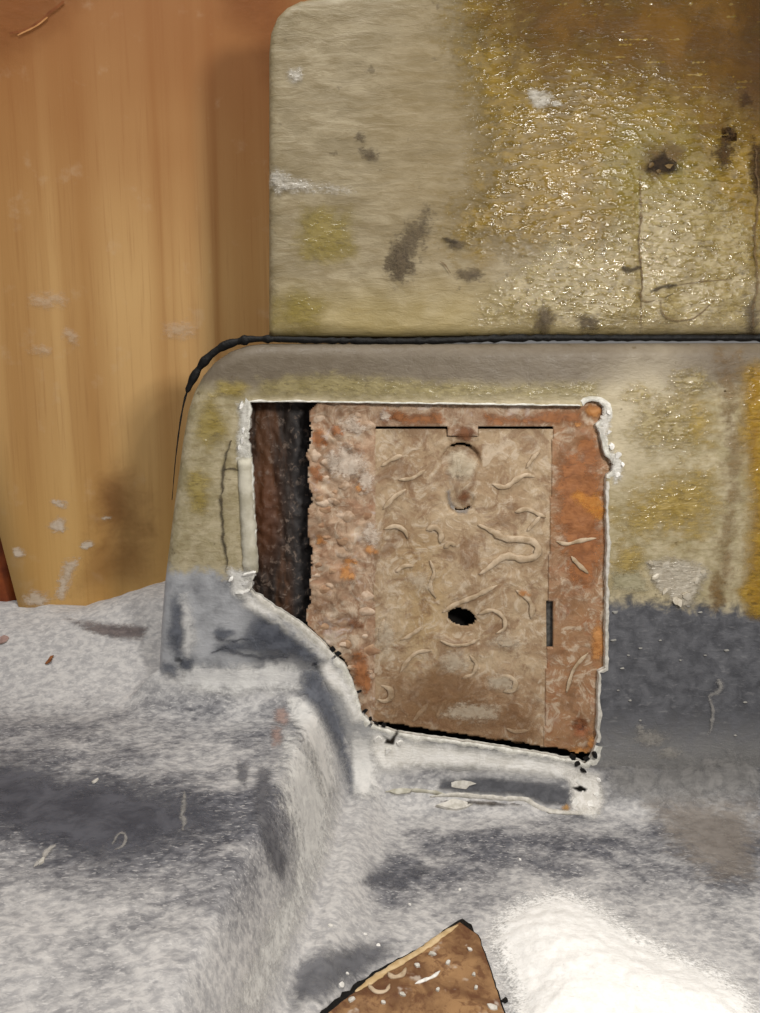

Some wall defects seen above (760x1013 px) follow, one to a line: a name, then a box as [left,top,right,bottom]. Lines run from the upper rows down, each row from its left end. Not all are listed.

damp [450,0,760,282]
damp [385,208,430,281]
crack [622,184,731,327]
rust [311,426,344,447]
rust [385,410,444,424]
rust [484,405,602,427]
rust [554,438,604,588]
damp [627,469,720,539]
damp [733,365,760,616]
peeling [611,559,708,613]
rust [353,652,371,694]
rust [592,626,604,659]